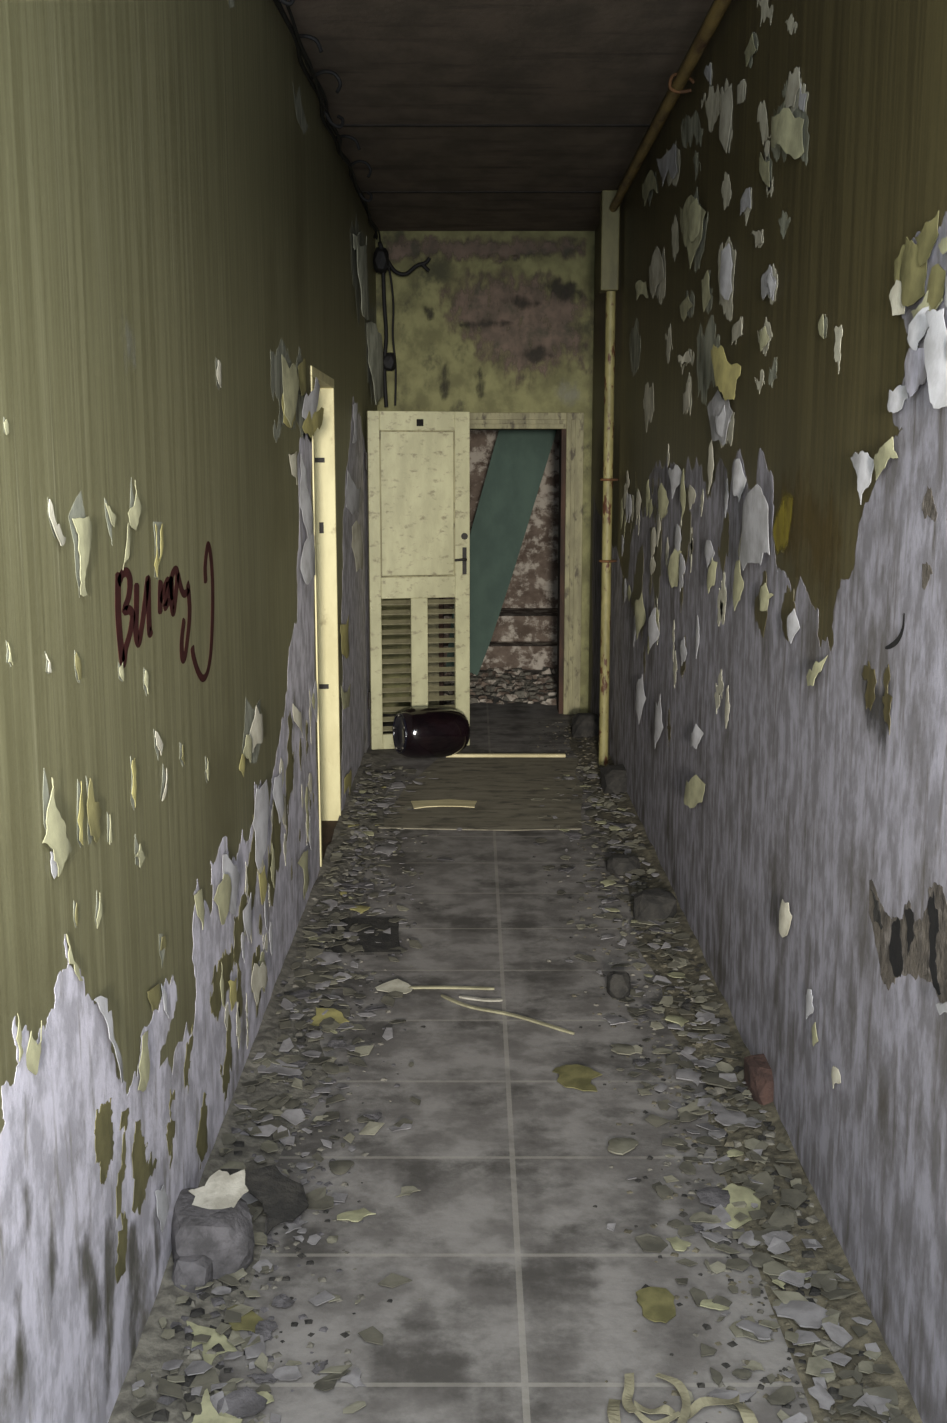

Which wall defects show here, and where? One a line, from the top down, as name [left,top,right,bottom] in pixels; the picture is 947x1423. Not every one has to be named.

peeling [0,339,324,1423]
peeling [591,0,947,1423]